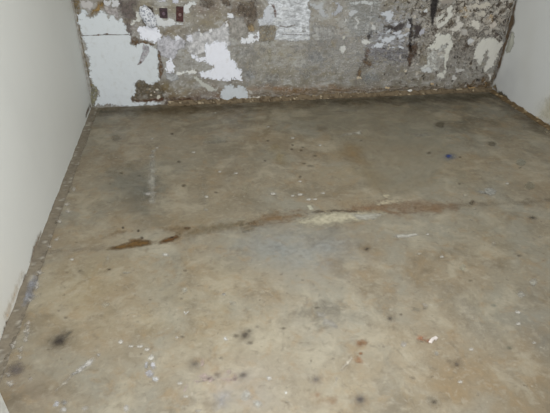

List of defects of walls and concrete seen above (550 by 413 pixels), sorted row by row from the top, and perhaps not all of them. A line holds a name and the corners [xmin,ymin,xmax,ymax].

peeling [73,0,276,116]
corrosion [407,44,423,66]
peeling [343,0,517,102]
corrosion [112,230,150,249]